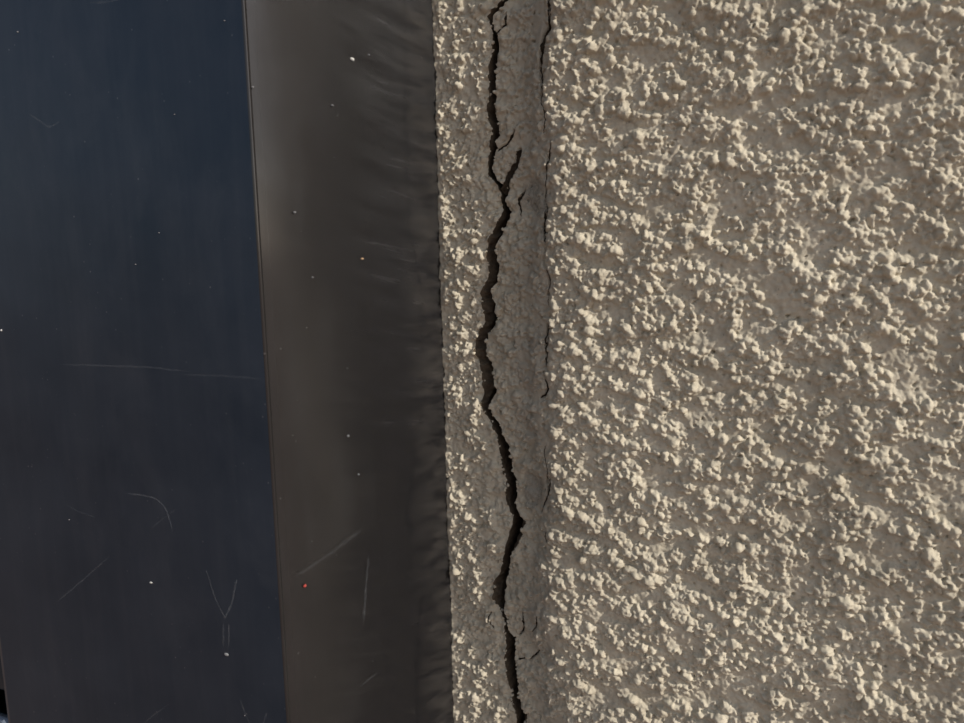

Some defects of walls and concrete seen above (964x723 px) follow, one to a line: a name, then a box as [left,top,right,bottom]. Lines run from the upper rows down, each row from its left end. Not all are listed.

crack [471,0,551,723]